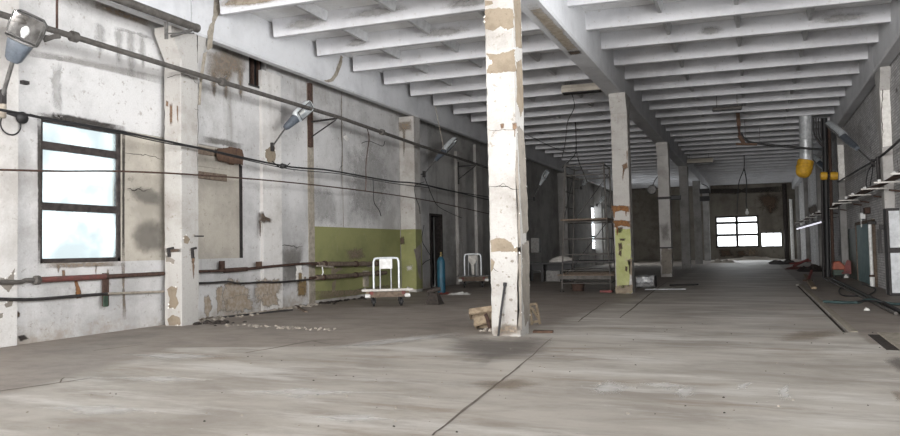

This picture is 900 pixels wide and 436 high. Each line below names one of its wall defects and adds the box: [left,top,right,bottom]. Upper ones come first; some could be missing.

leakage [211,51,243,97]
peeling [483,0,530,331]
leakage [137,225,159,249]
peeling [167,286,181,326]
peeling [204,286,223,317]
peeling [255,278,282,307]